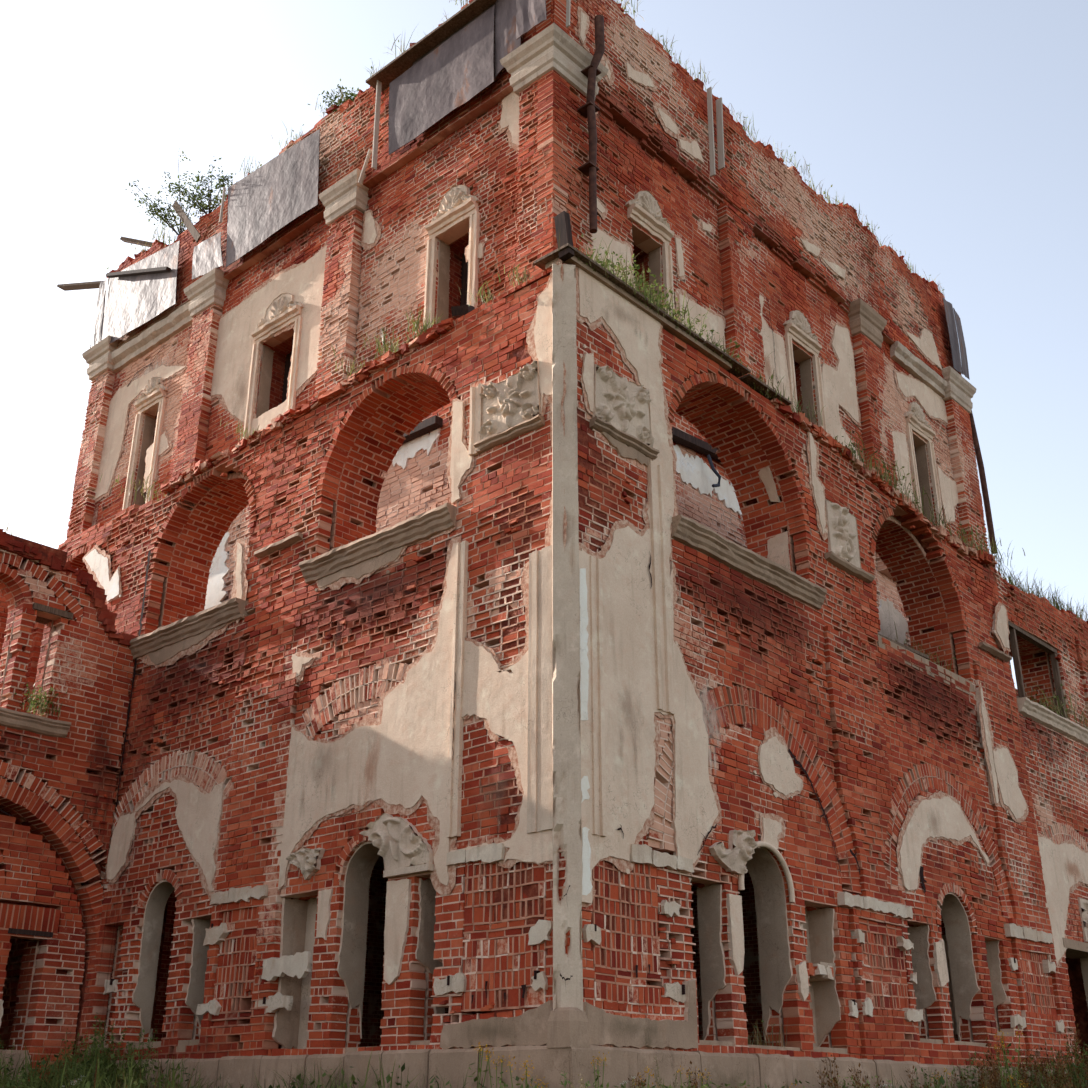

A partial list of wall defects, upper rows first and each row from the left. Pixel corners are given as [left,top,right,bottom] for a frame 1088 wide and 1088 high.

peeling [92,363,187,503]
spalling [83,415,266,604]
peeling [211,212,331,435]
peeling [759,293,861,541]
peeling [894,370,948,426]
peeling [892,430,959,526]
peeling [64,750,226,900]
peeling [132,398,567,1049]
peeling [526,259,841,1047]
peeling [850,791,992,891]
spalling [875,598,1088,966]
peeling [907,893,1007,1041]